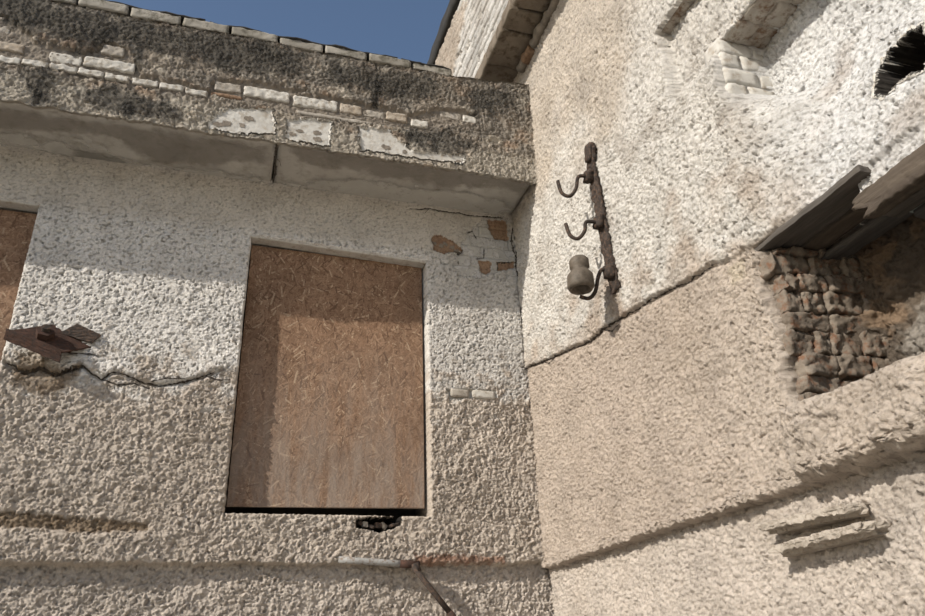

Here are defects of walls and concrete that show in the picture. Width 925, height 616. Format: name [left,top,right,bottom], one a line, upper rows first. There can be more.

damp [134,41,147,71]
spalling [0,15,479,164]
crack [273,140,281,182]
peeling [431,218,516,278]
crack [525,262,720,371]
crack [7,352,230,389]
hole [356,516,402,533]